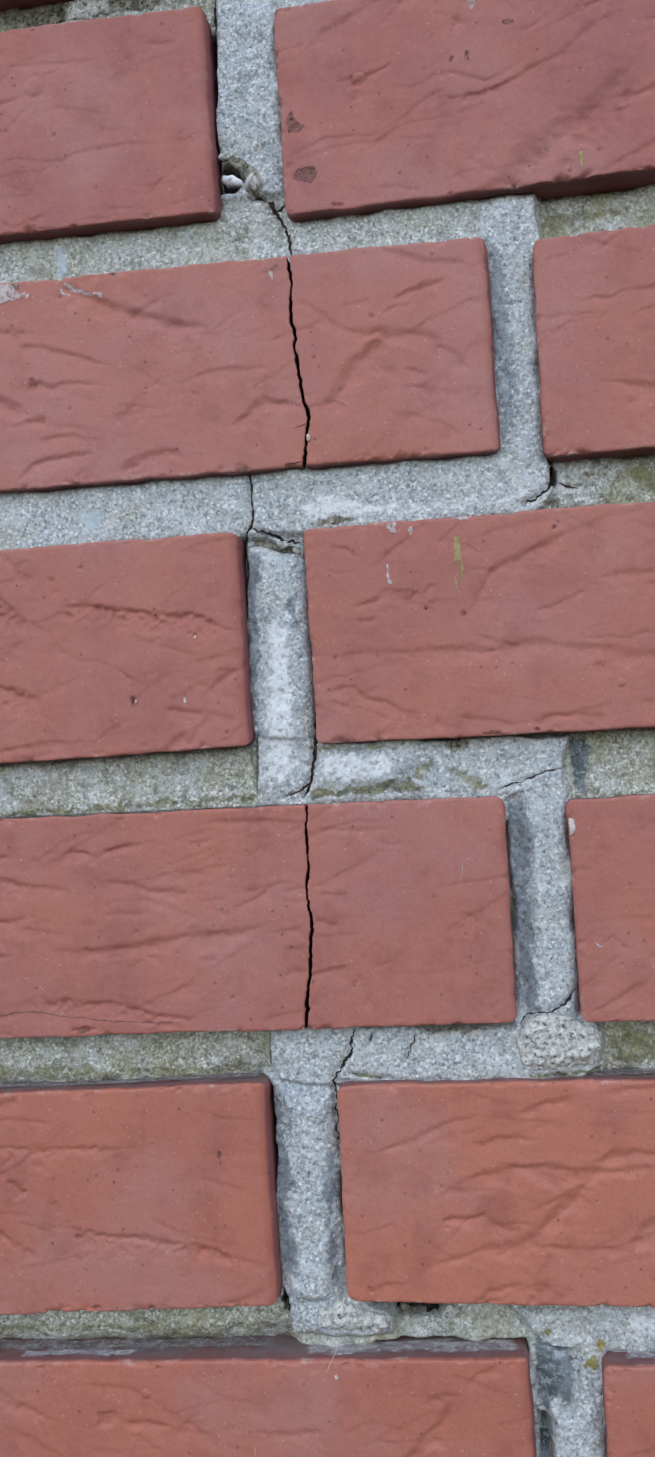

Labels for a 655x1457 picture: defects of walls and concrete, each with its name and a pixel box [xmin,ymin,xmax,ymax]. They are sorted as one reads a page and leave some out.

crack [253,197,311,469]
crack [247,475,302,545]